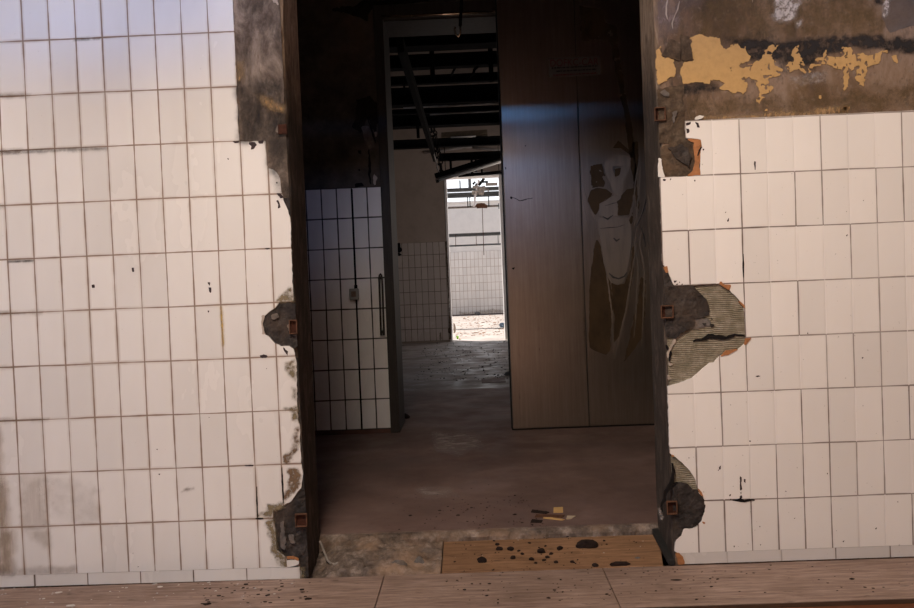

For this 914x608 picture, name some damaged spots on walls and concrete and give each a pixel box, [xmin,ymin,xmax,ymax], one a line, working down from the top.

flaking render [233,0,291,219]
damp [684,83,716,93]
peeling [655,0,898,181]
damp [697,0,914,65]
damp [699,87,914,120]
flaking render [882,0,914,33]
spalling [663,266,751,385]
spalling [261,257,443,578]
spalling [671,454,706,565]